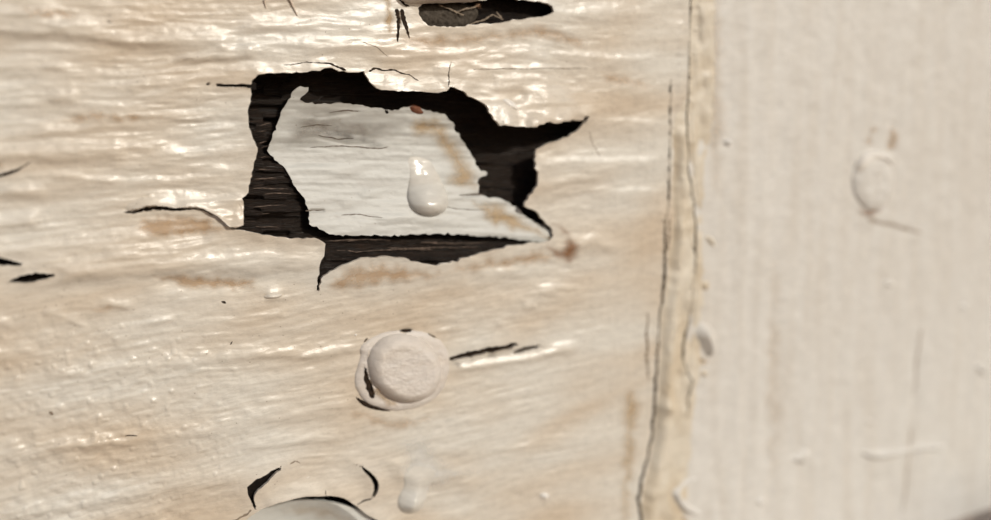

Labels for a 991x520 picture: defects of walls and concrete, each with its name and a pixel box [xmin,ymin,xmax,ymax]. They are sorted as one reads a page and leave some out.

spalling [458,0,552,25]
spalling [124,61,600,290]
spalling [10,272,54,283]
crack [449,343,537,360]